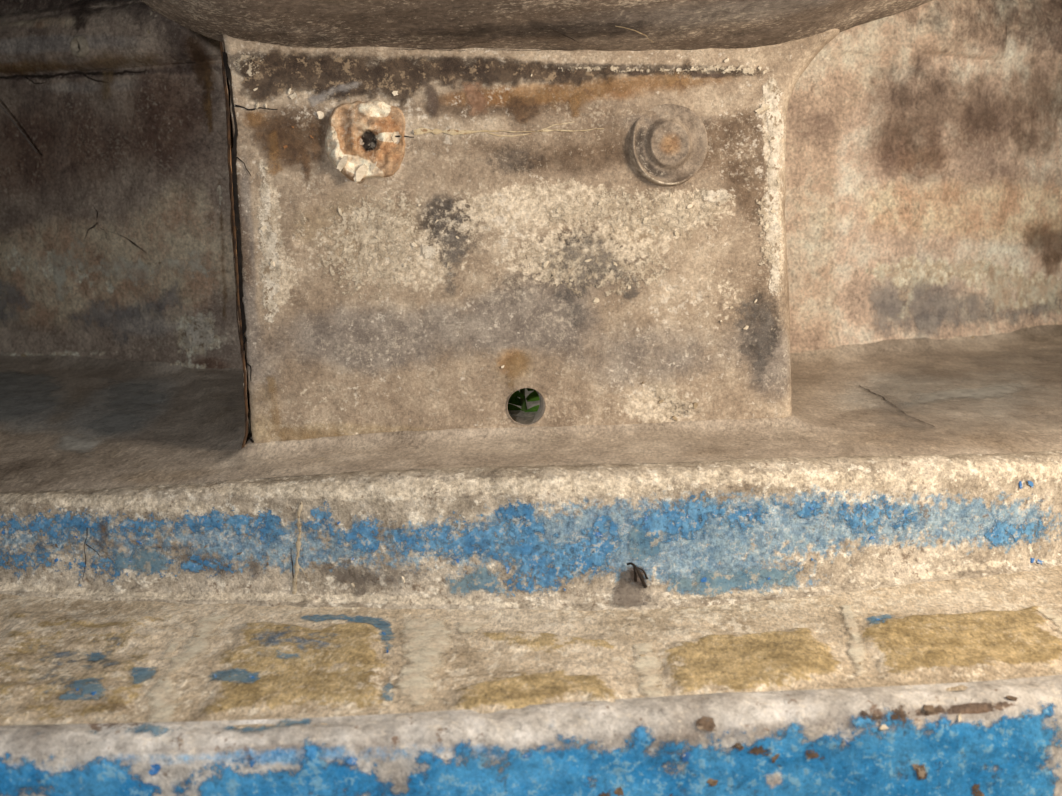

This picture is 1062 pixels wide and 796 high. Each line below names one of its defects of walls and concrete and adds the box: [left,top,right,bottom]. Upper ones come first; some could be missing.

leakage [67,0,146,30]
crack [0,70,147,84]
leakage [240,50,666,115]
rust [509,80,612,123]
rust [248,114,323,180]
leakage [870,231,1062,336]
peeling [0,505,288,586]
peeling [303,489,932,608]
peeling [979,515,1051,549]
peeling [301,614,395,653]
peeling [132,667,166,684]
peeling [0,695,1062,796]